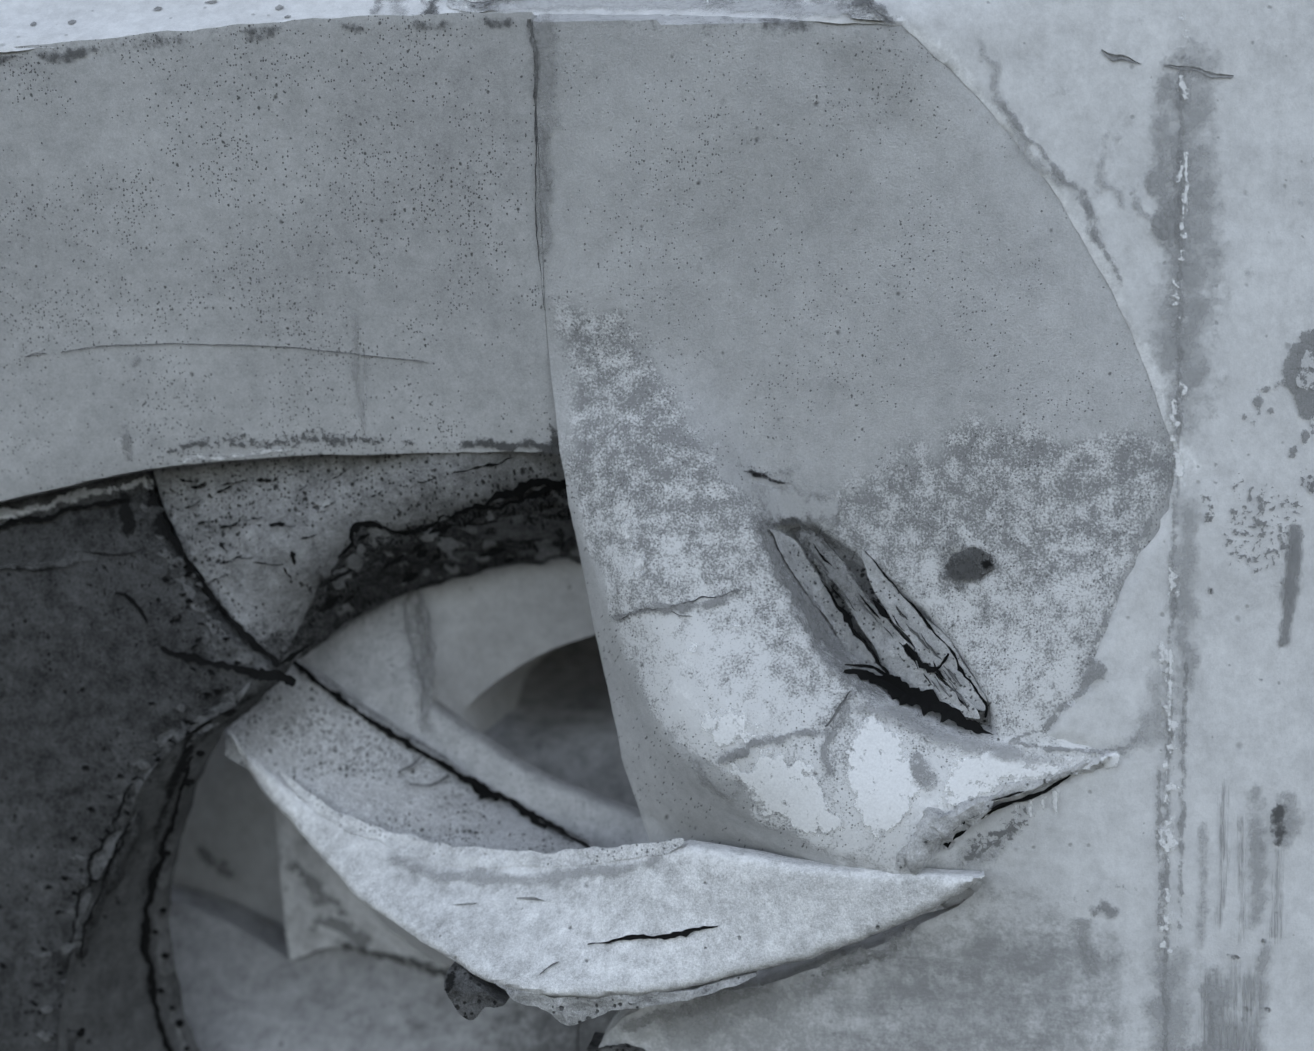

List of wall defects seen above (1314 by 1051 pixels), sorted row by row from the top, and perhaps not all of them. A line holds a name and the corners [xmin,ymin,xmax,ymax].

leakage [421,0,439,14]
leakage [981,49,1122,281]
spalling [167,429,415,463]
spalling [461,426,560,456]
spalling [280,478,581,664]
spalling [745,470,994,735]
leakage [1098,54,1302,1051]
spalling [280,772,684,885]
crack [516,895,544,903]
crack [588,926,718,945]
leakage [1076,902,1118,970]
spalling [444,961,758,1051]